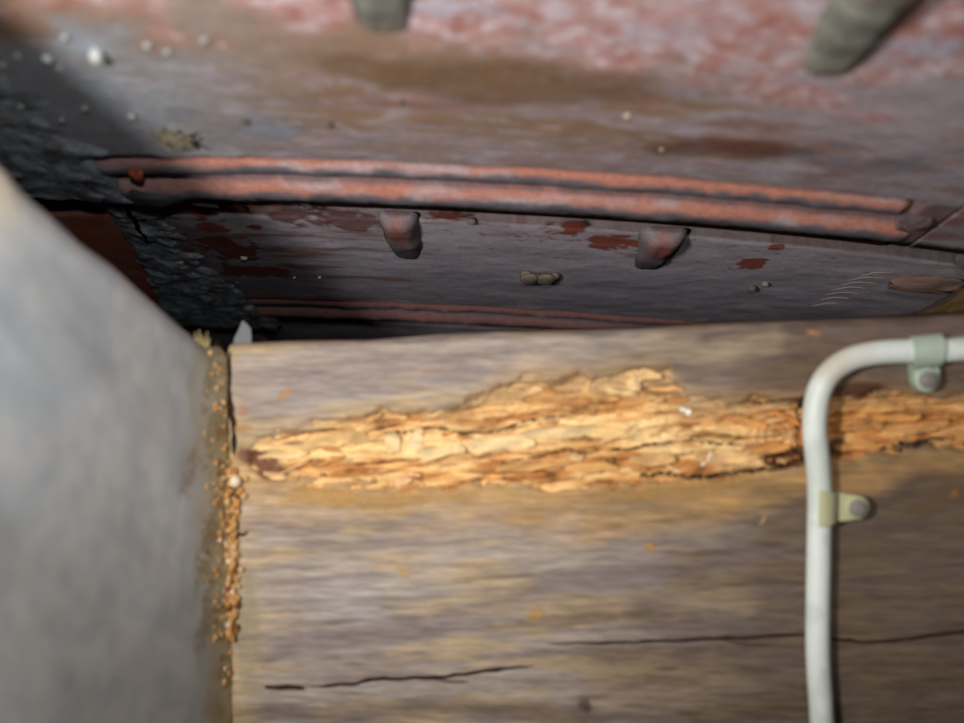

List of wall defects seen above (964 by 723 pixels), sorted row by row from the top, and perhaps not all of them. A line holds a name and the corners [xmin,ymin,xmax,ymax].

peeling [259,368,803,480]
peeling [857,403,964,438]
crack [546,633,805,646]
crack [830,630,964,644]
crack [265,665,535,690]